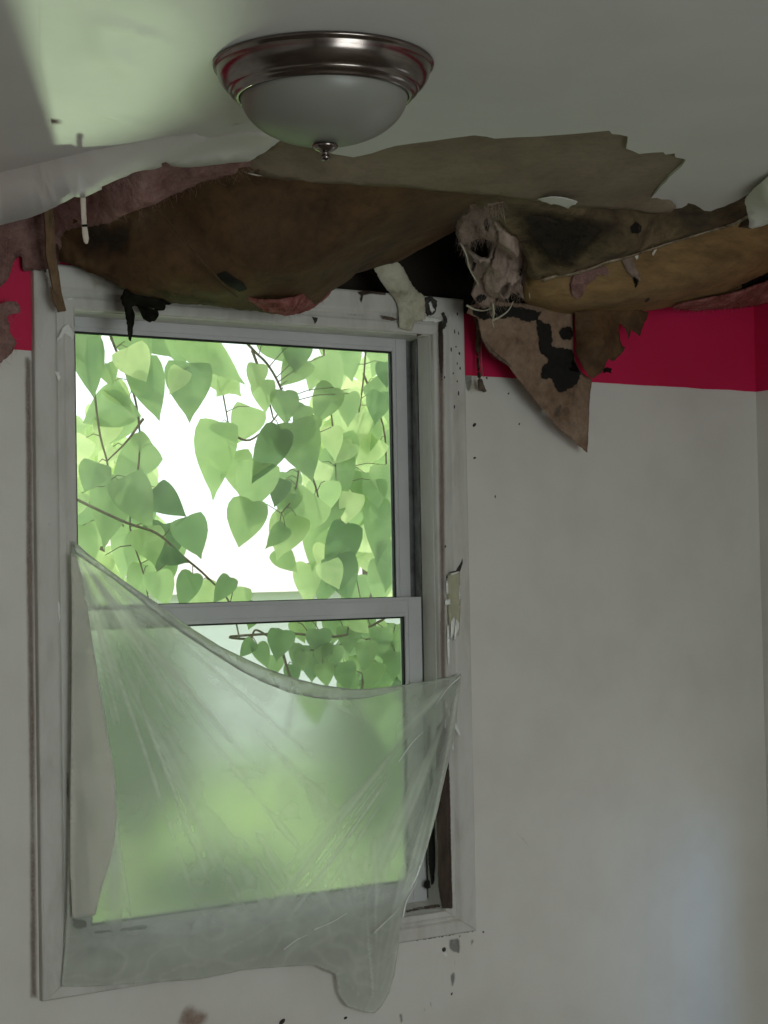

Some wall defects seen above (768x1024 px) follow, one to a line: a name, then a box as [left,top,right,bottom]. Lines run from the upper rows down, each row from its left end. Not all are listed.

water stain [83,227,129,255]
water stain [524,214,610,266]
peeling [423,296,461,409]